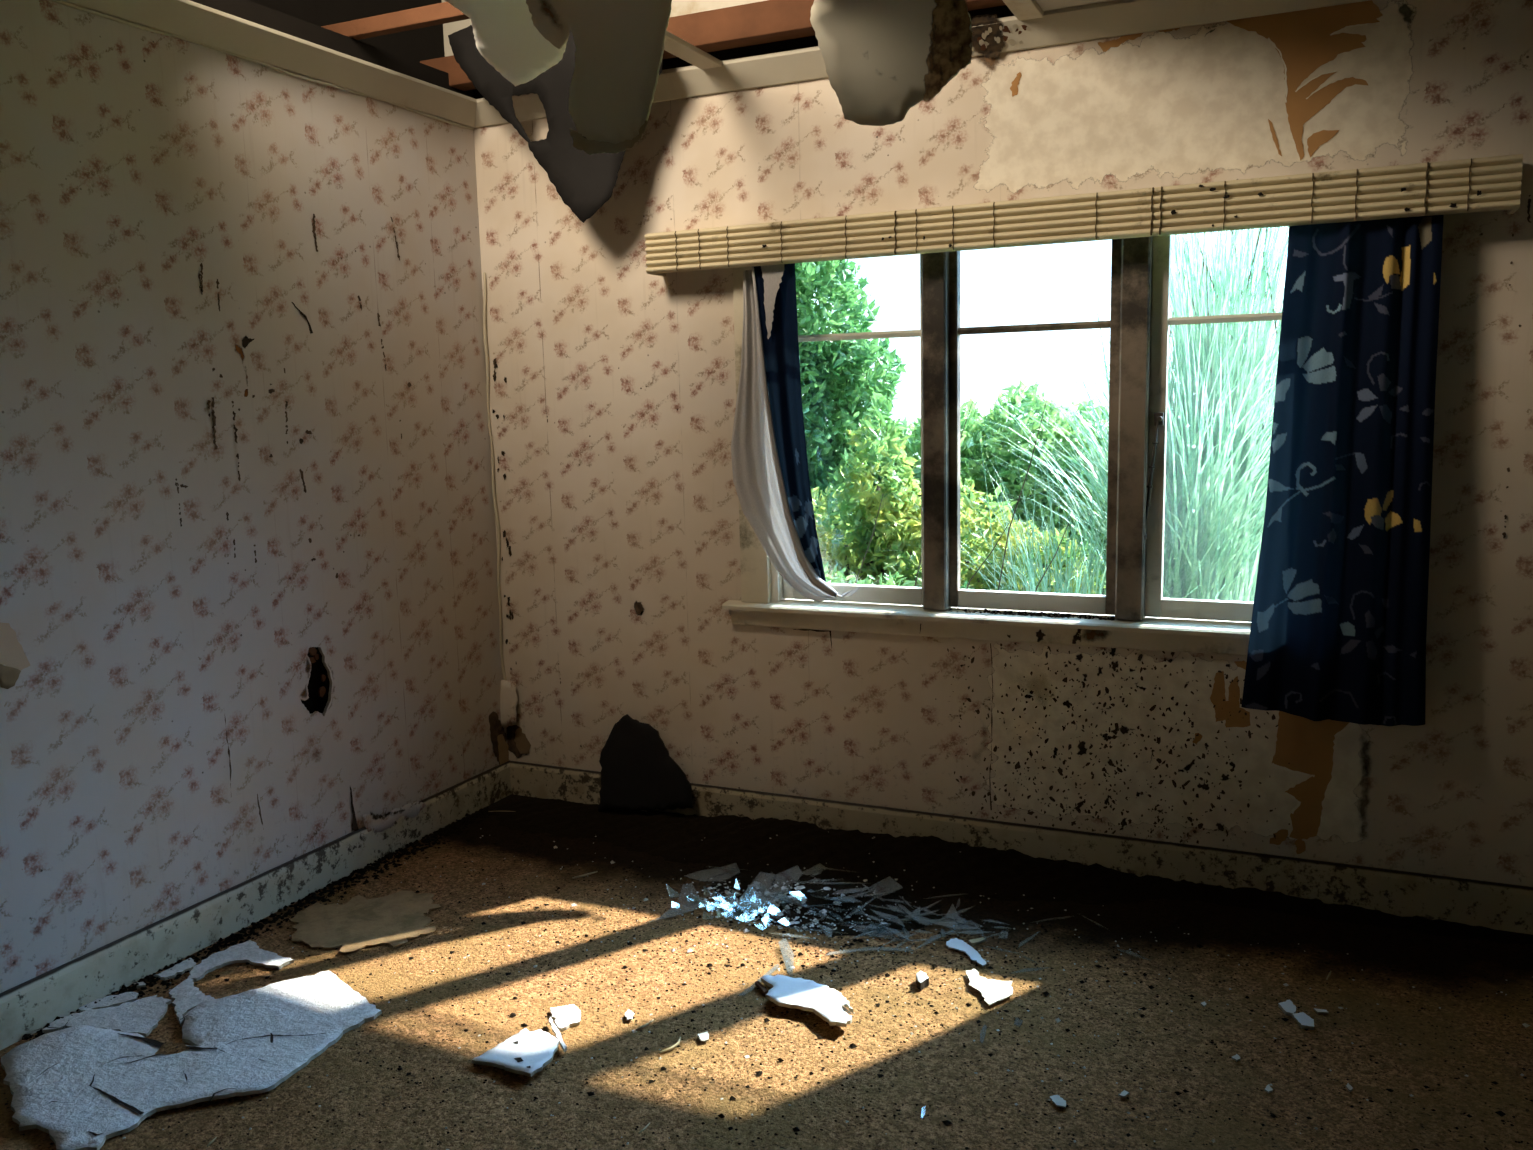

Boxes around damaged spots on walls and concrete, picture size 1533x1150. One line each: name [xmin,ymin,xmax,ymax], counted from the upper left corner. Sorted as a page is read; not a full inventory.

peeling [971,14,1031,70]
peeling [1307,130,1339,157]
leakage [947,629,1290,844]